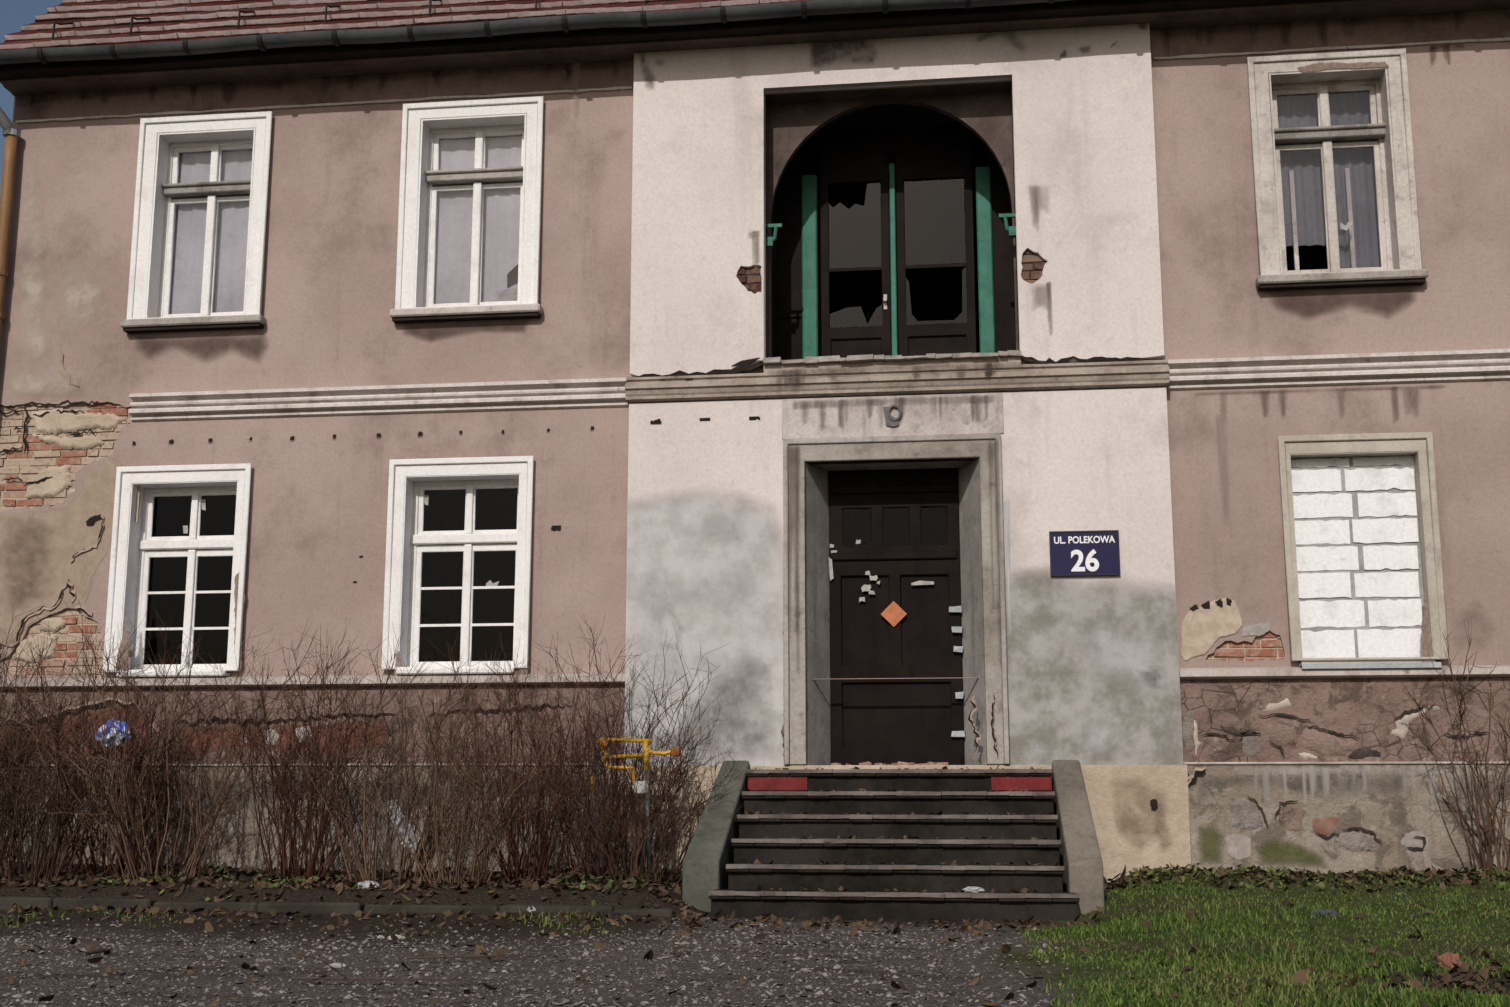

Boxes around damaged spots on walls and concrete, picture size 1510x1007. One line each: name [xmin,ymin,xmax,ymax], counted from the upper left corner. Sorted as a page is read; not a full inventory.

flaking render [737,266,761,294]
flaking render [1021,249,1047,284]
peeling [0,402,134,679]
crack [0,514,105,648]
peeling [1181,598,1284,662]
flaking render [1182,710,1201,756]
flaking render [1239,698,1315,757]
flaking render [1333,748,1381,759]
peeling [1391,703,1440,739]
flaking render [1401,831,1429,857]